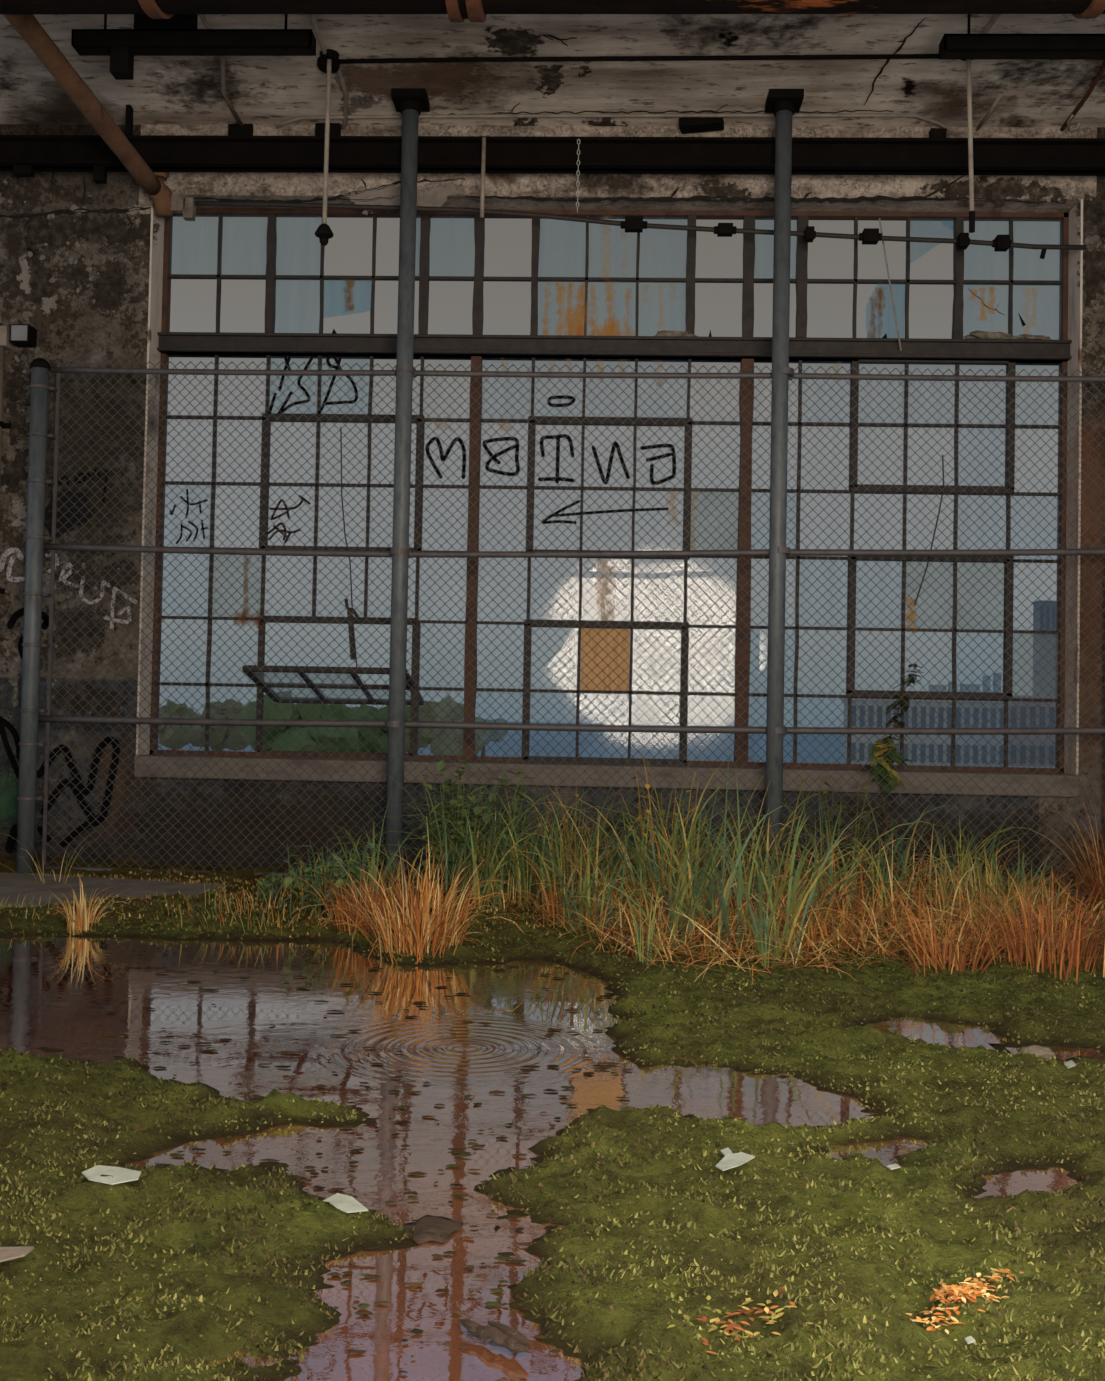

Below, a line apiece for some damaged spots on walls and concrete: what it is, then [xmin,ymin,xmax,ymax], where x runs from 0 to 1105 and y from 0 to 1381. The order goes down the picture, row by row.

crack [542,34,576,46]
crack [491,103,765,114]
damp [667,14,820,55]
crack [799,18,925,113]
peeling [0,173,160,318]
corrosion [543,216,674,336]
spalling [919,176,1105,308]
corrosion [600,559,612,621]